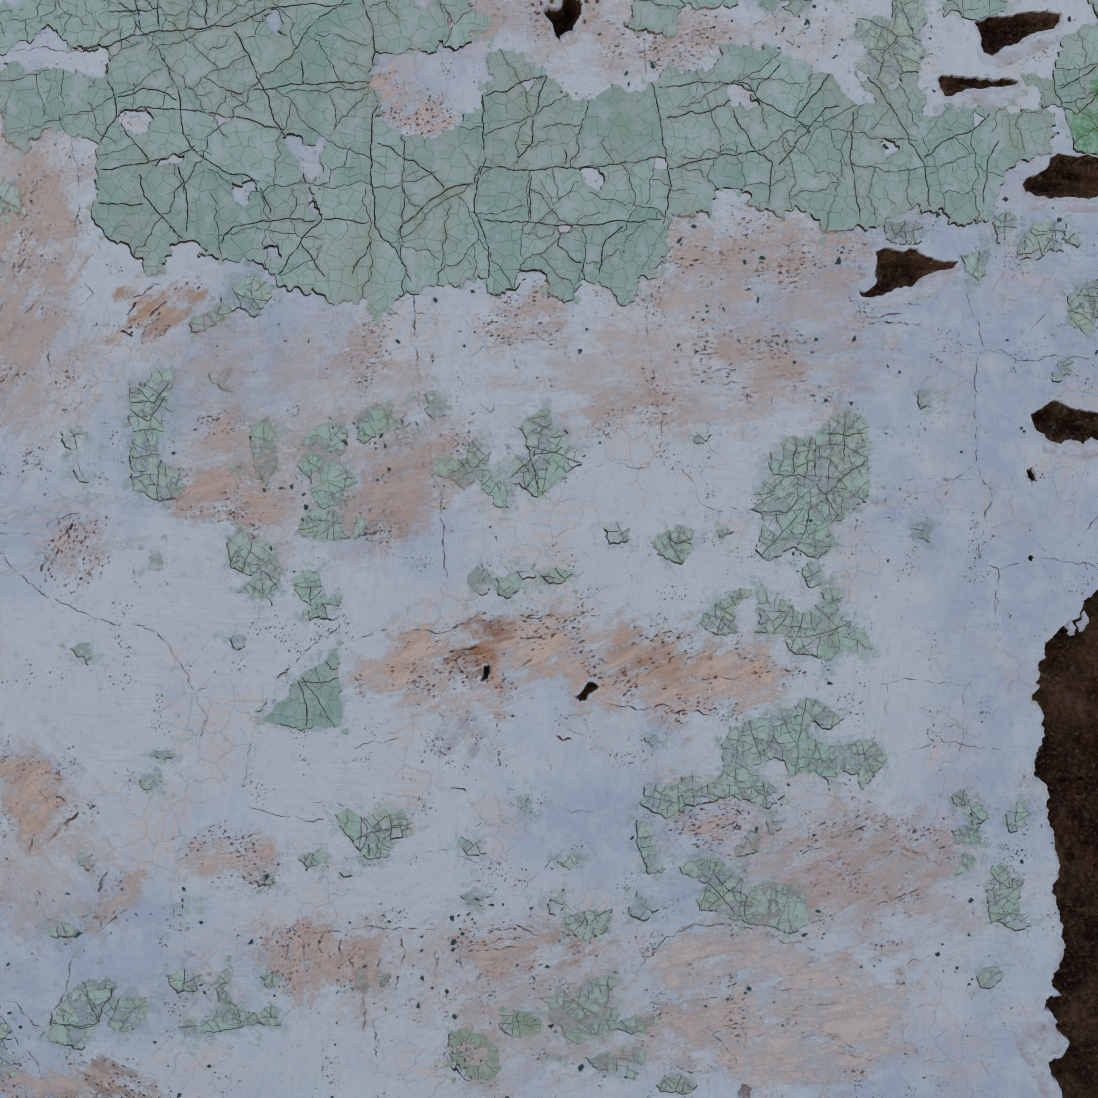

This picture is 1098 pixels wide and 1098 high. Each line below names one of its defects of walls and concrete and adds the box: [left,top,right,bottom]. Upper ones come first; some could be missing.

peeling [0,0,1098,341]
peeling [61,430,99,497]
peeling [121,353,185,502]
peeling [431,409,586,508]
peeling [908,388,940,415]
spalling [1029,399,1098,450]
peeling [949,787,992,881]
spalling [1005,588,1098,1098]
peeling [978,858,1038,936]
peeling [971,966,1004,995]